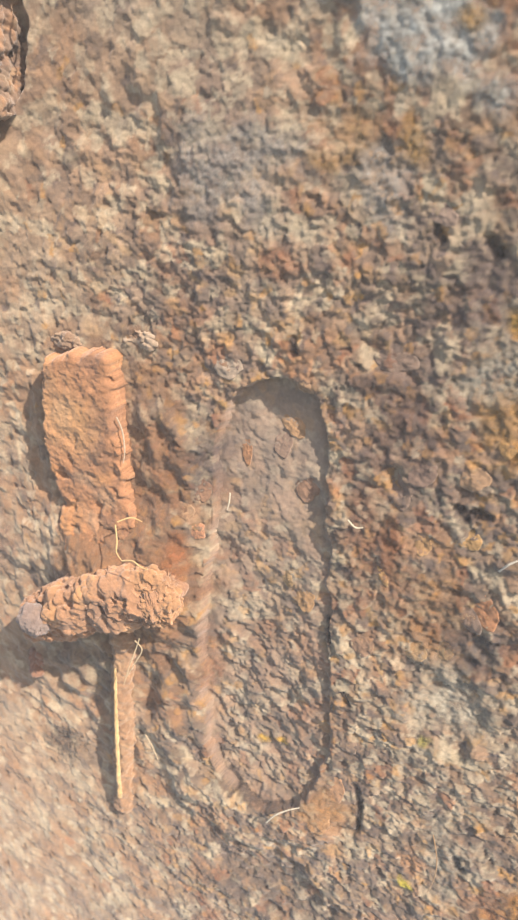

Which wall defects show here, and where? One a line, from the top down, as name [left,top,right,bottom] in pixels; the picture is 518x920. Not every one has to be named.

rust [214,356,243,380]
rust [374,349,420,373]
rust [296,478,320,503]
rust [390,457,438,511]
rust [459,468,492,492]
rust [455,529,483,551]
rust [404,586,499,662]
rust [349,636,375,658]